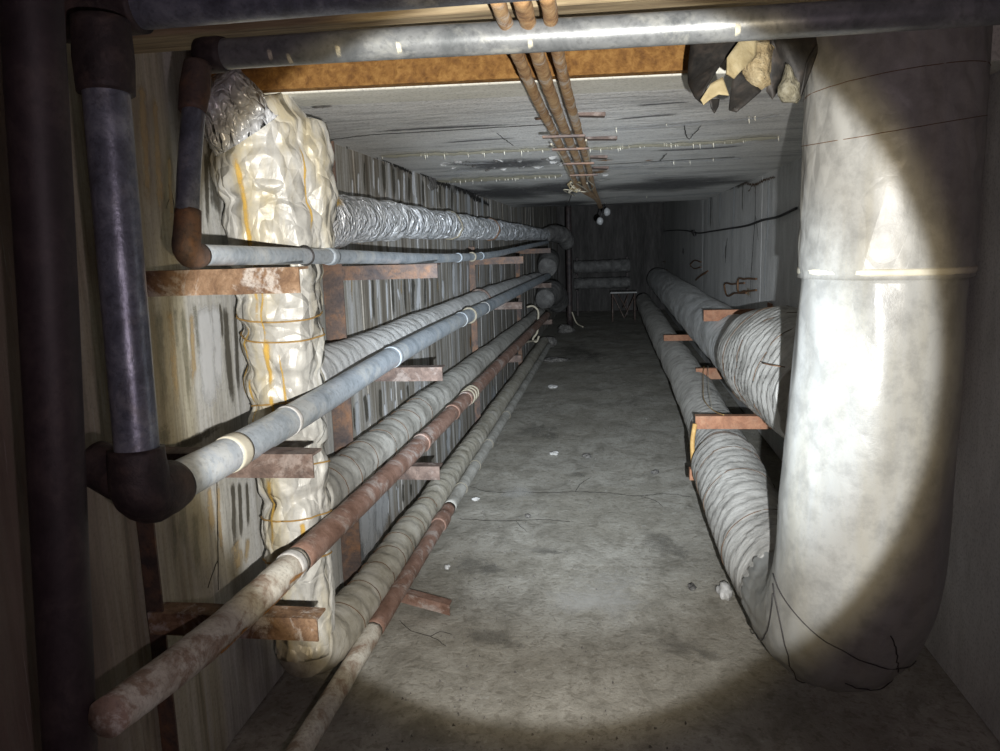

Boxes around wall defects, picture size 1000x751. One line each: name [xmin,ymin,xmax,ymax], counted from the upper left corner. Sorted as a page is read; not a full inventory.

damp [352,136,779,216]